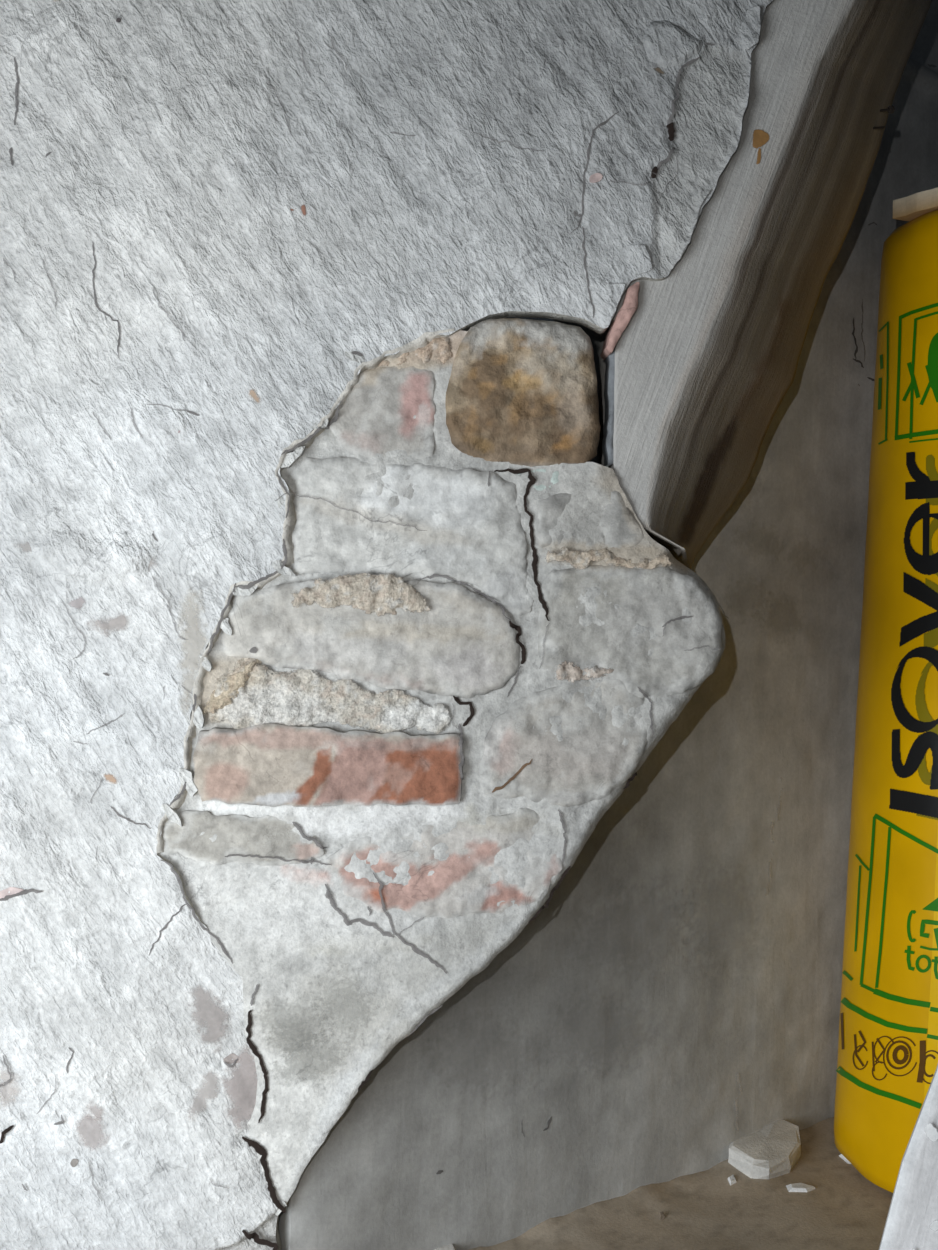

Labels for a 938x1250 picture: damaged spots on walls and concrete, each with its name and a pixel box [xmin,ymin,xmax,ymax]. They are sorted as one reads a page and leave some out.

crack [9,57,19,166]
crack [92,241,120,355]
spalling [156,329,454,853]
crack [422,468,550,697]
spalling [546,547,672,570]
spalling [556,660,614,683]
crack [453,696,474,779]
crack [110,782,186,829]
crack [149,859,233,964]
crack [225,822,447,974]
crack [242,984,286,1213]
crack [242,1229,278,1250]